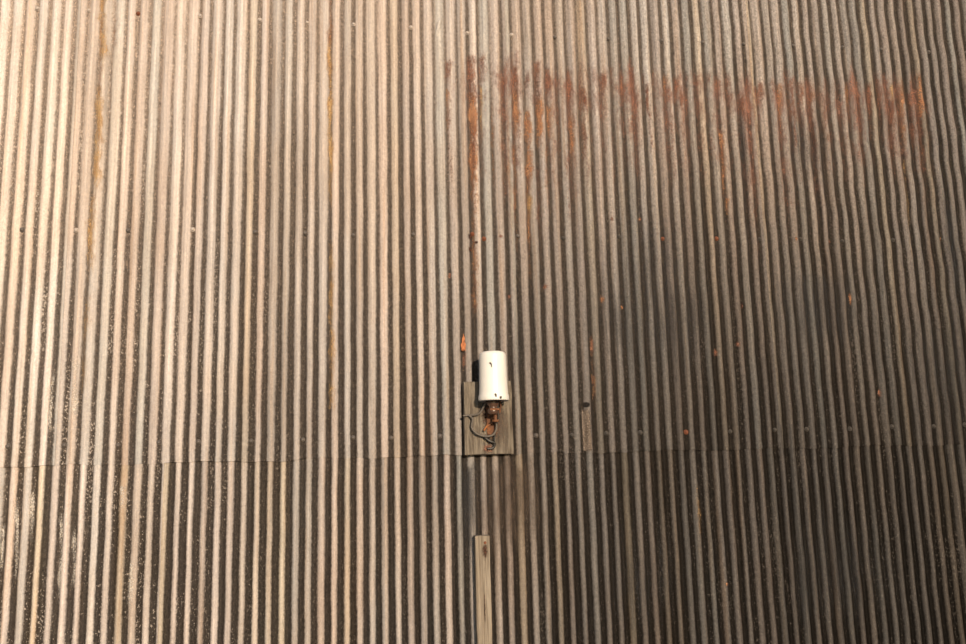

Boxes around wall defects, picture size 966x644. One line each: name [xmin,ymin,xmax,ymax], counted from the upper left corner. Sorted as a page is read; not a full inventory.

corrosion [467,56,483,222]
corrosion [496,60,650,180]
corrosion [697,74,924,149]